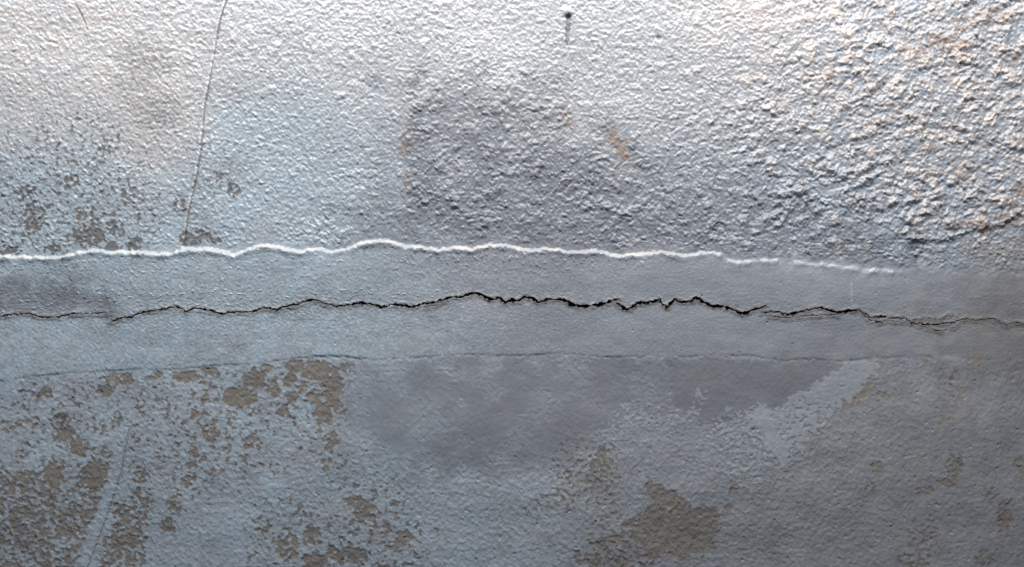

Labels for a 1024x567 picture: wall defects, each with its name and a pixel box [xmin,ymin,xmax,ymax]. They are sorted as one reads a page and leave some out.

peeling [0,113,155,255]
peeling [179,226,221,246]
peeling [215,172,241,198]
damp [404,103,504,244]
crack [1,292,1024,332]
peeling [0,360,423,567]
peeling [524,360,879,567]